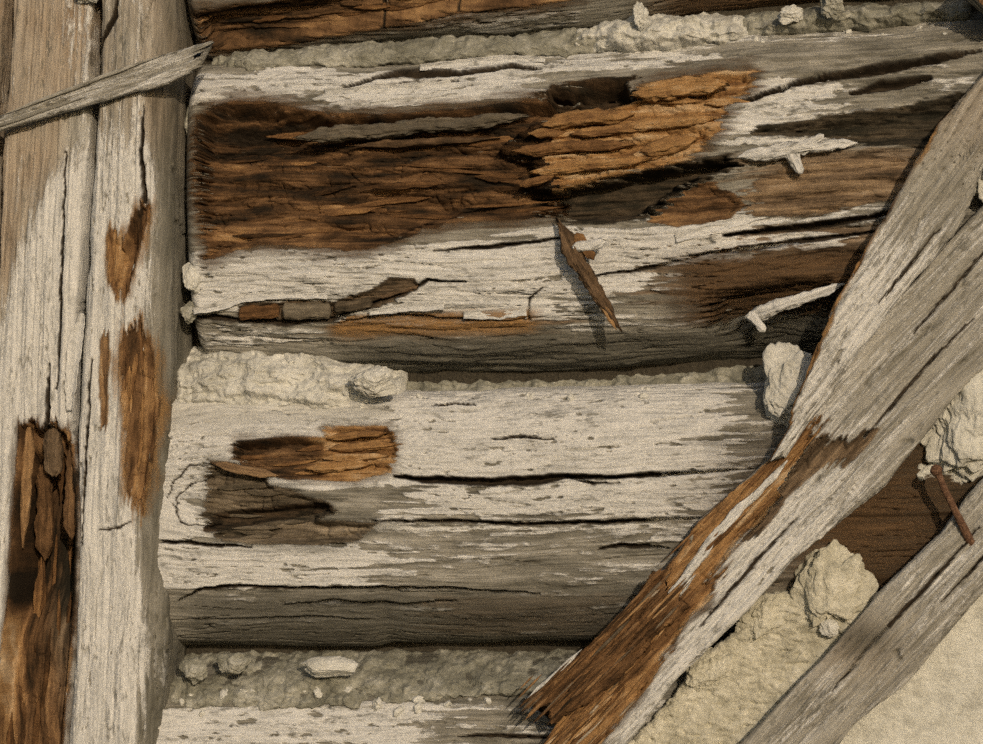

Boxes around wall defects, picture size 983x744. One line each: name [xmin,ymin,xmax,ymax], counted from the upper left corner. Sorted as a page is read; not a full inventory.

crack [102,0,119,46]
crack [734,49,981,103]
spalling [186,55,764,265]
crack [434,238,560,251]
crack [45,151,68,429]
crack [419,278,466,286]
crack [197,314,345,327]
peeling [64,313,85,411]
spalling [200,426,401,545]
crack [394,472,661,487]
spalling [0,417,81,744]